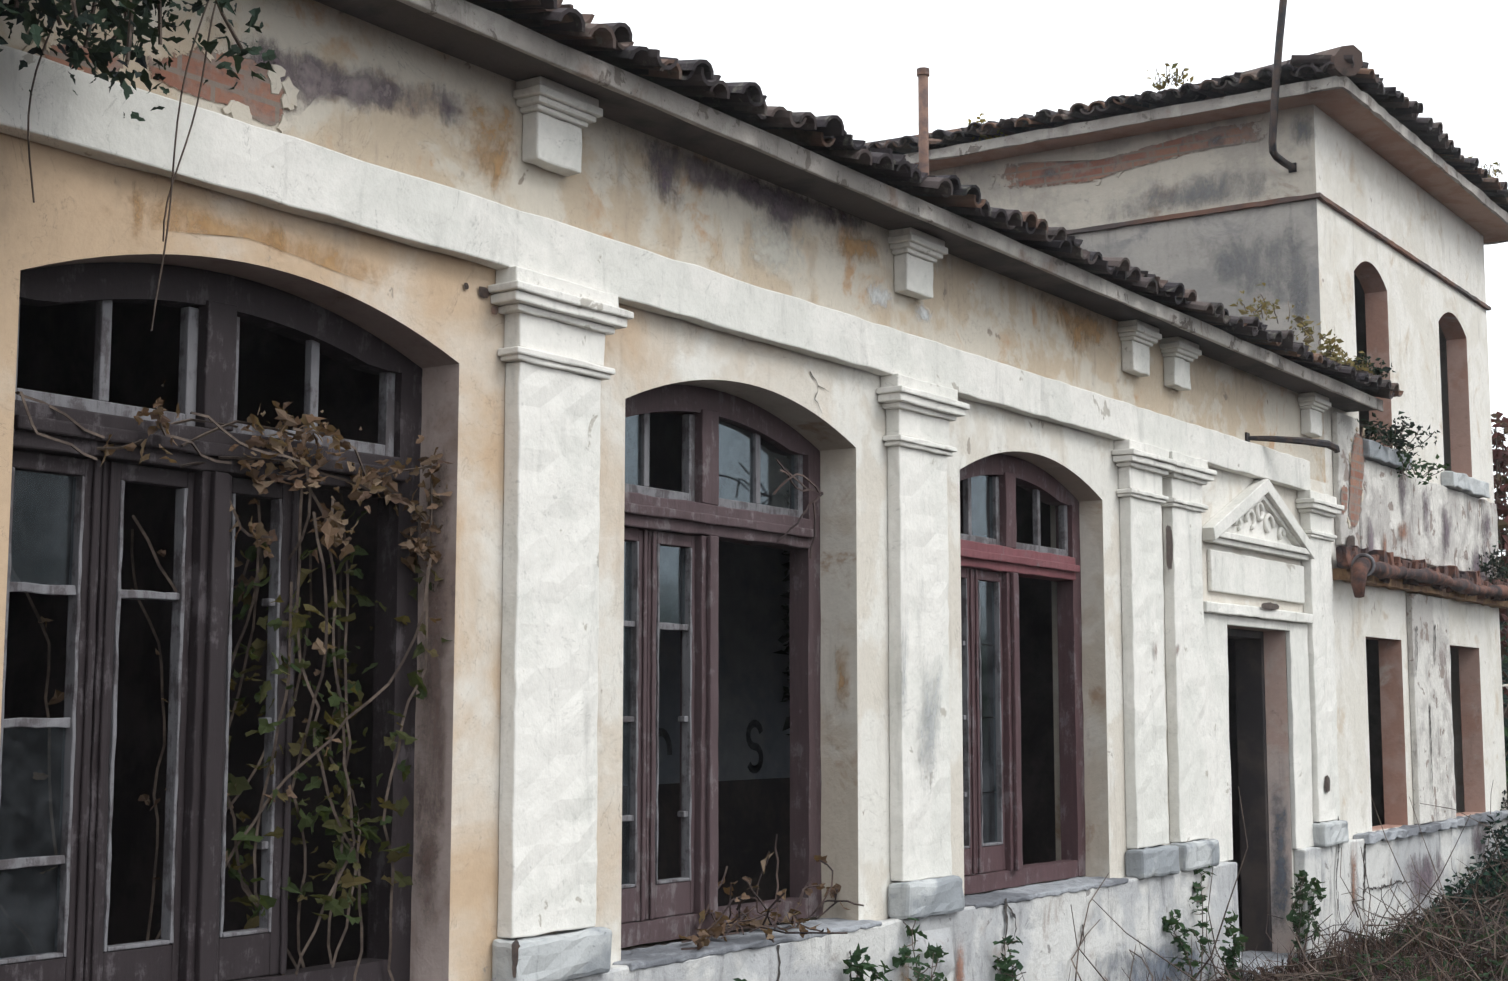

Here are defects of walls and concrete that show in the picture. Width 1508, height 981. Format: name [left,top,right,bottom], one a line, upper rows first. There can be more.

peeling [147,47,299,134]
damp [254,43,410,106]
flaking render [988,116,1267,189]
damp [649,150,862,232]
damp [1127,175,1235,211]
damp [1217,243,1306,317]
damp [1423,494,1450,549]
damp [1472,516,1494,579]